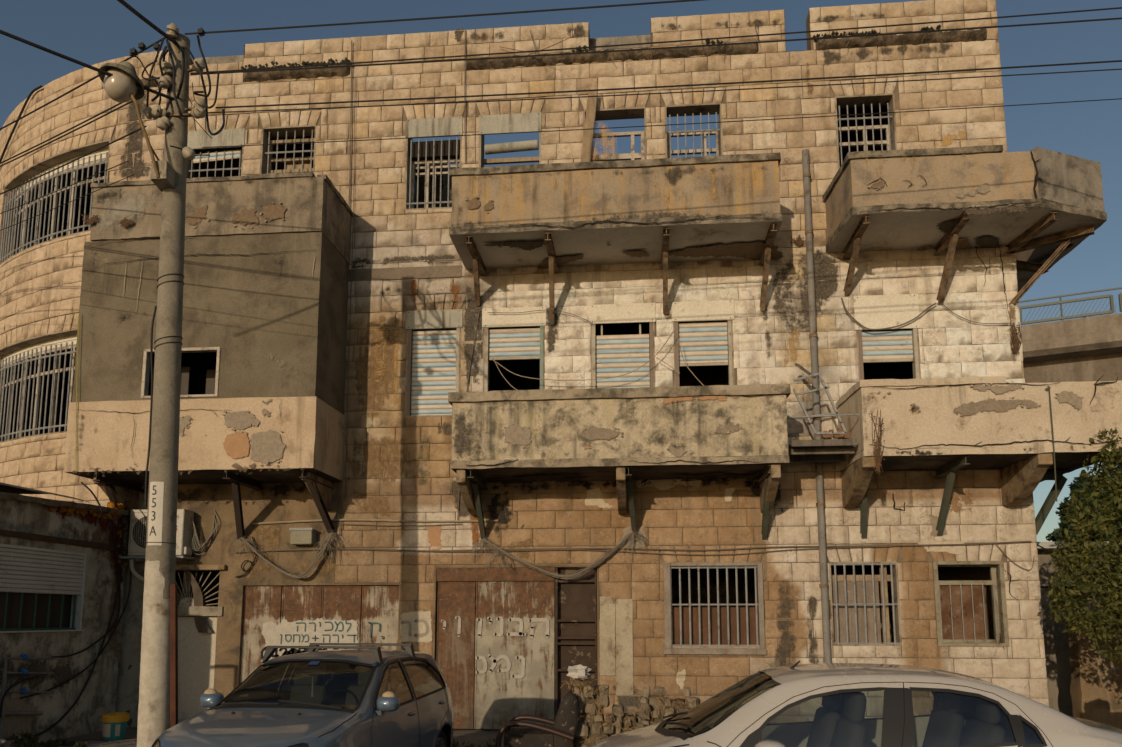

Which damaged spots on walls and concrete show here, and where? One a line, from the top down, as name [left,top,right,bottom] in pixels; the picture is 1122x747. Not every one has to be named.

water stain [97,92,155,230]
crack [861,151,1044,212]
water stain [668,241,838,363]
water stain [356,316,400,416]